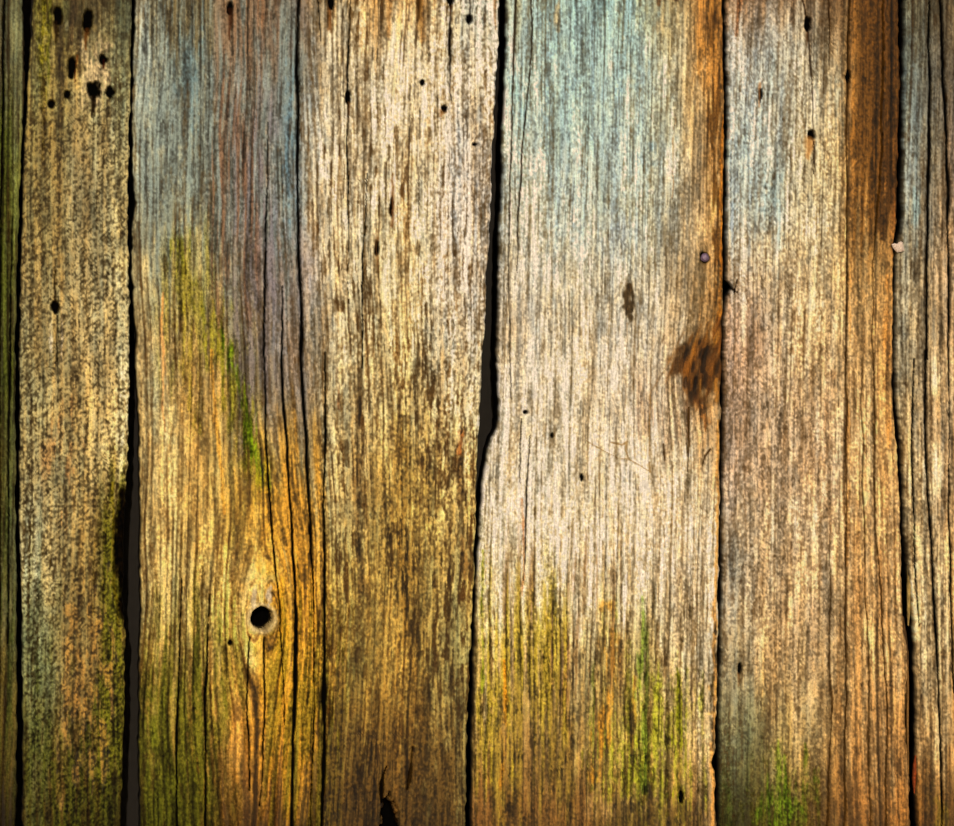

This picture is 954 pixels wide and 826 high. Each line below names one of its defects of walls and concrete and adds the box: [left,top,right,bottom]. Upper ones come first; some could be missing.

crack [344,0,352,90]
water stain [147,197,262,466]
crack [245,0,329,826]
crack [345,121,368,369]
water stain [625,253,723,462]
crack [910,0,954,826]
crack [174,577,184,826]
crack [203,593,212,826]
water stain [140,363,717,826]